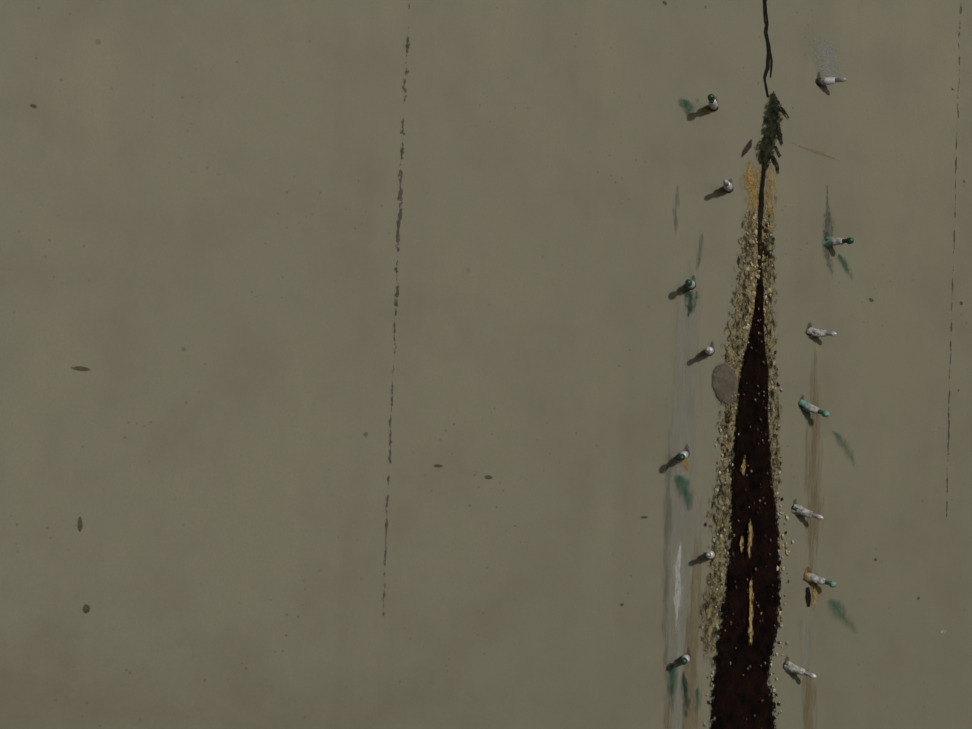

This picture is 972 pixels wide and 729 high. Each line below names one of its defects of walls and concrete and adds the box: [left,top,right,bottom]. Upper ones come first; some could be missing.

crack [763,0,773,97]
crack [758,166,771,284]
water stain [664,204,795,729]